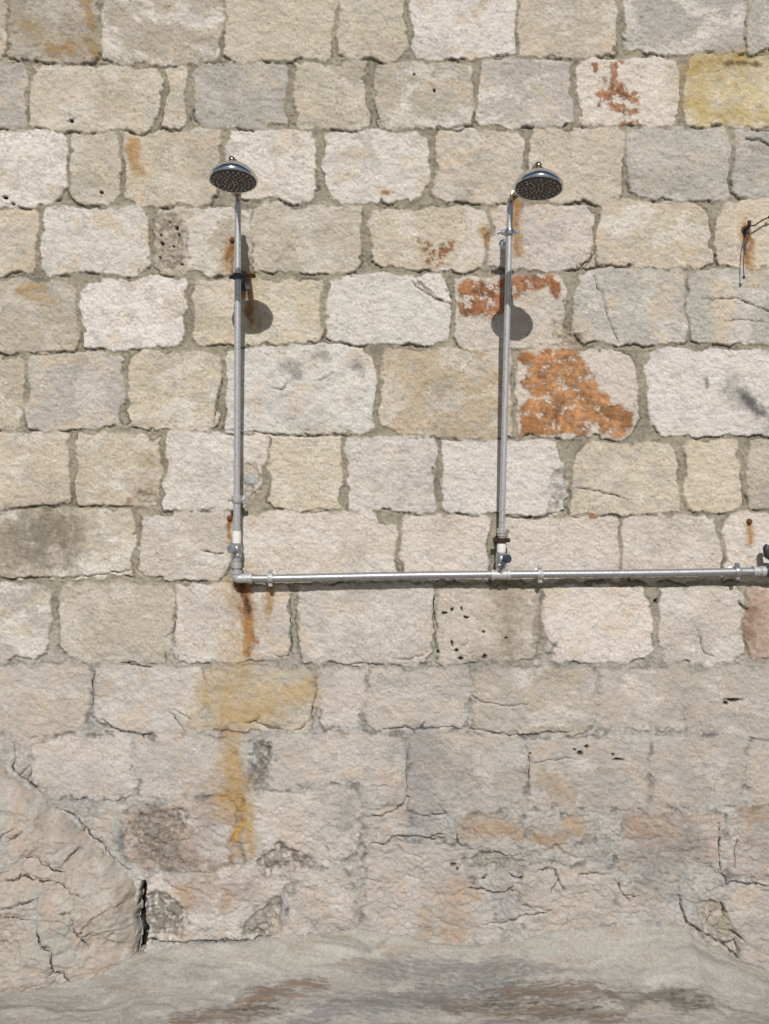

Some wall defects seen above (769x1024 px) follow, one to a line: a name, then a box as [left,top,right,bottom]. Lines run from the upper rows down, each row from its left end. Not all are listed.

corrosion [233,582,258,656]
crack [374,723,569,846]
crack [0,835,89,980]
crack [469,868,636,923]
crack [679,827,768,957]